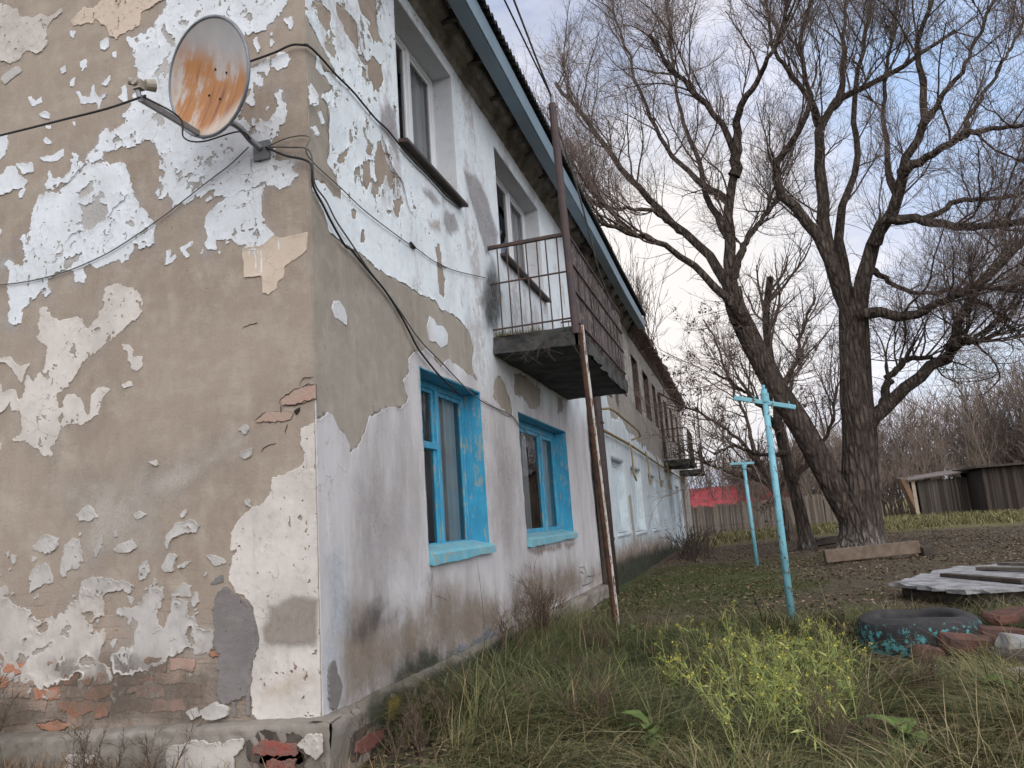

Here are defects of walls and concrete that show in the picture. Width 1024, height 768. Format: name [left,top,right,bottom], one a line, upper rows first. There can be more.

damp [465,172,498,253]
damp [484,272,500,327]
peeling [0,0,476,768]